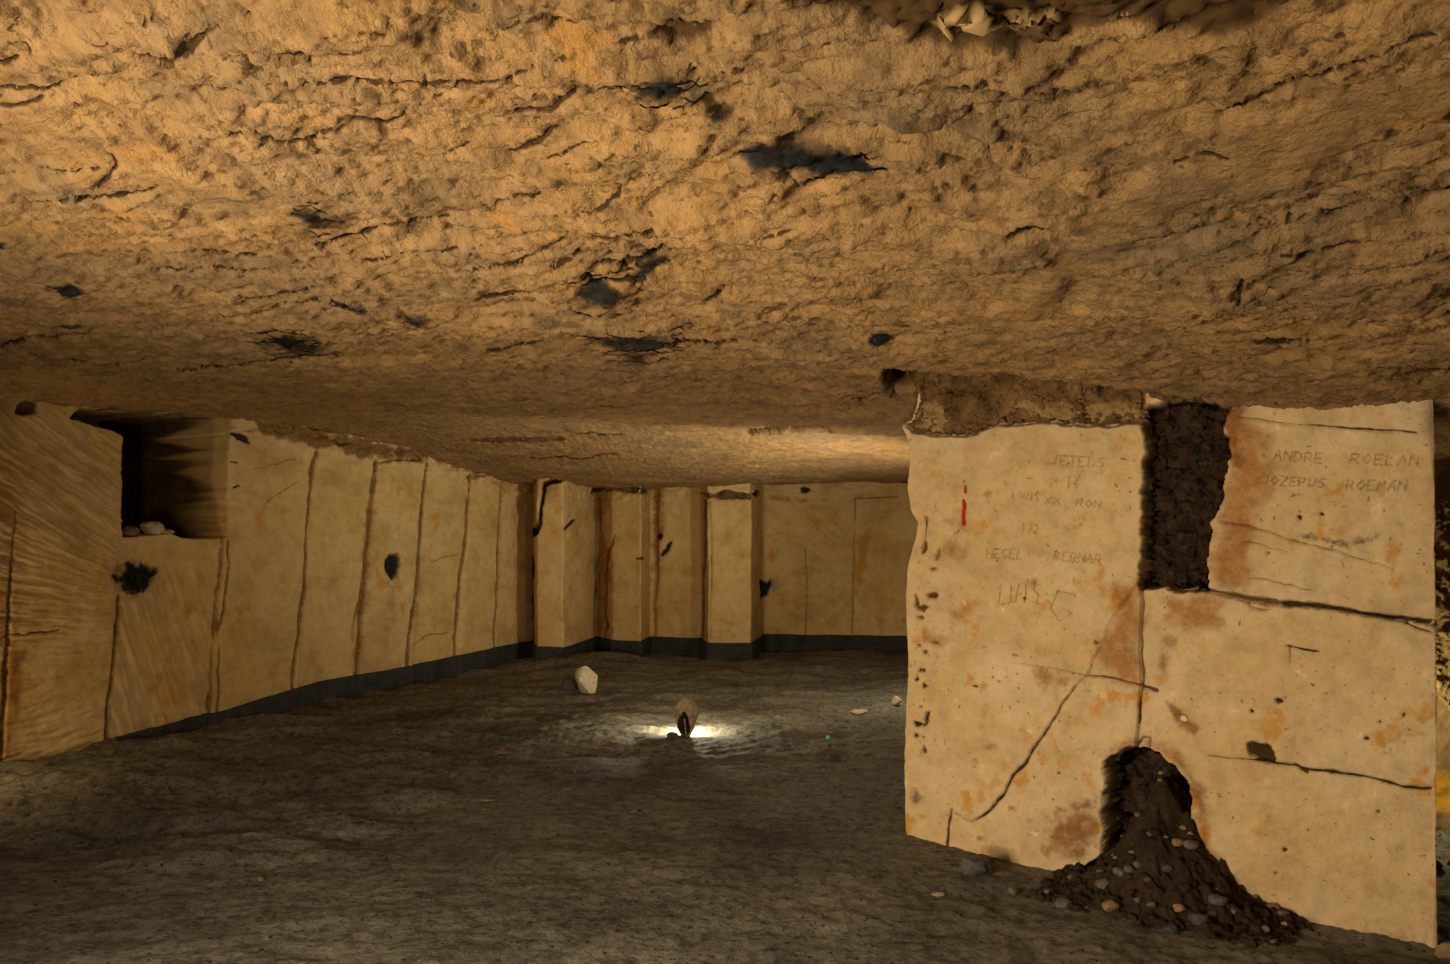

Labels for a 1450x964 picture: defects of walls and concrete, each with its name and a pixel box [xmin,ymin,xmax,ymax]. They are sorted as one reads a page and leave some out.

crack [0,519,60,761]
crack [946,588,1158,846]
crack [1210,742,1432,790]